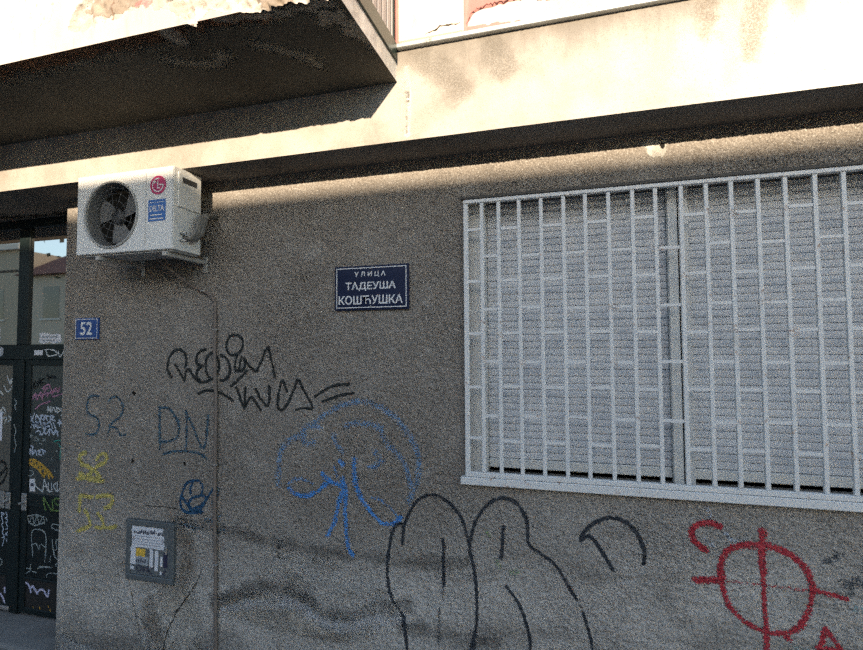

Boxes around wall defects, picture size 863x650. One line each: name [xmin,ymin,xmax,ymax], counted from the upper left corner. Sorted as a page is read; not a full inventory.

spalling [68,0,373,47]
crack [163,568,201,650]